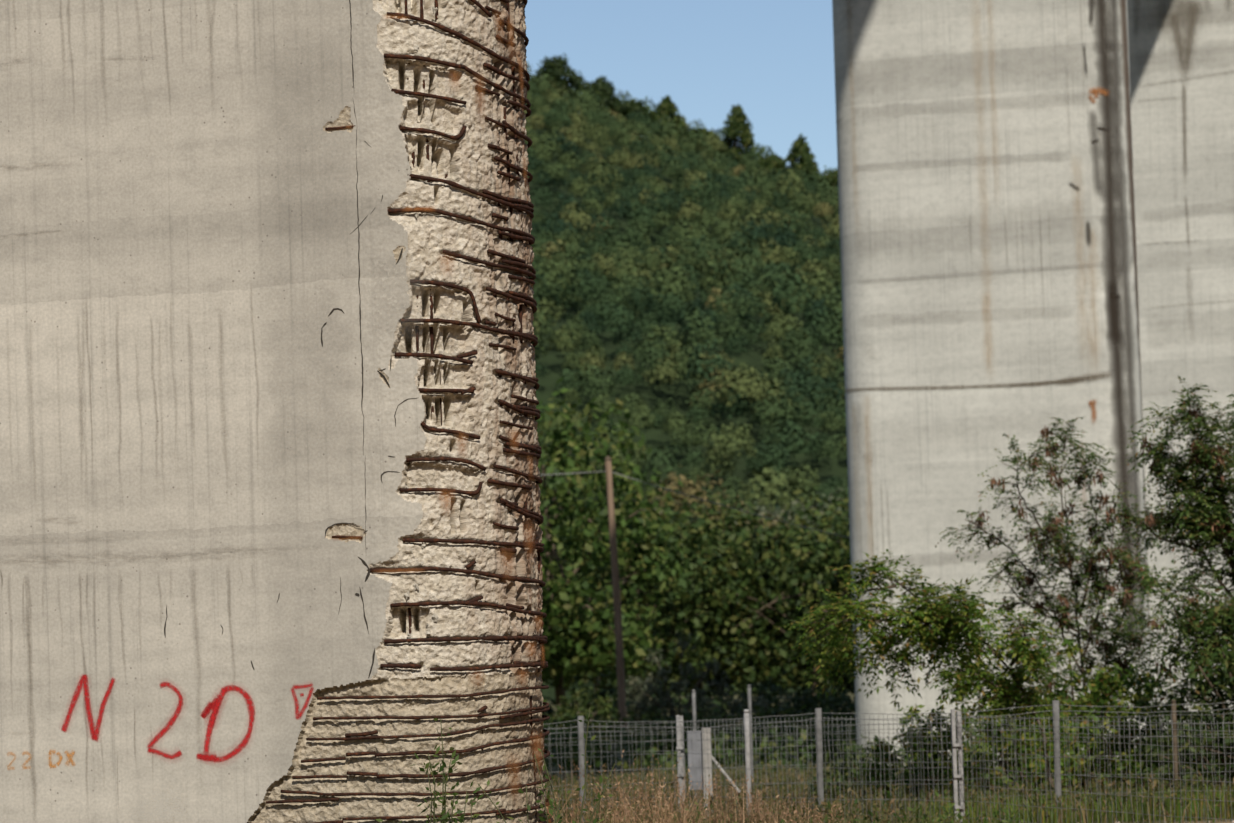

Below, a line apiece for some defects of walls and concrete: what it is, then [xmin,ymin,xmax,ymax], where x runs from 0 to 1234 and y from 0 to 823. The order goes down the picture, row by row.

spalling [247,0,554,823]